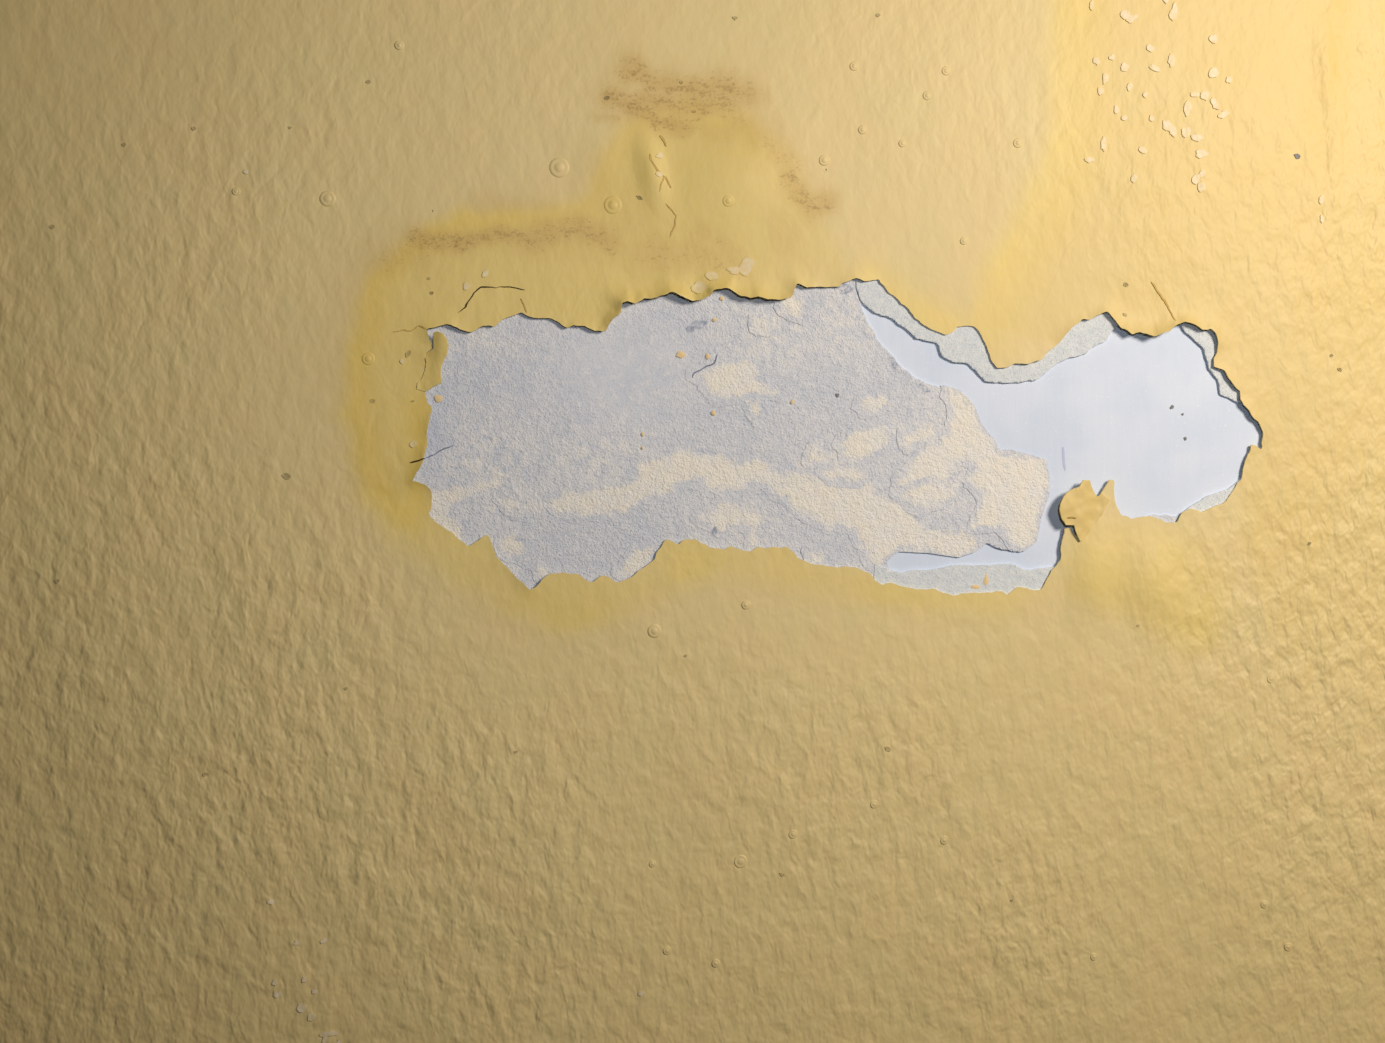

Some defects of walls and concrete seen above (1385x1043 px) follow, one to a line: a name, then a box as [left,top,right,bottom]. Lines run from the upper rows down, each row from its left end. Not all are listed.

peeling [400,256,1262,595]
damp [322,0,1385,736]